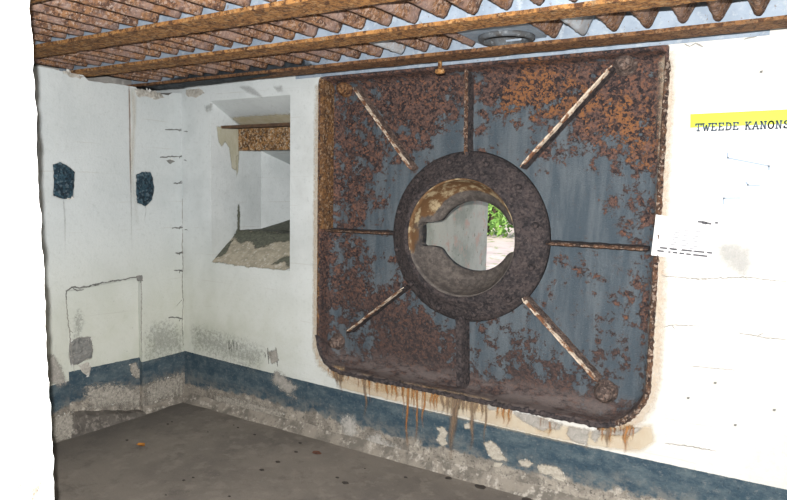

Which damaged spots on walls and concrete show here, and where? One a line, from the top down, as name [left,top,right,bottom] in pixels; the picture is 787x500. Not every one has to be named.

peeling [53,162,75,200]
peeling [135,172,154,206]
corrosion [662,86,672,216]
crack [169,181,187,334]
corrosion [313,112,570,446]
crack [66,277,142,366]
peeling [48,337,184,409]
corrosion [587,256,664,450]
peeling [51,411,75,444]
peeling [436,426,448,446]
peeling [483,441,507,468]